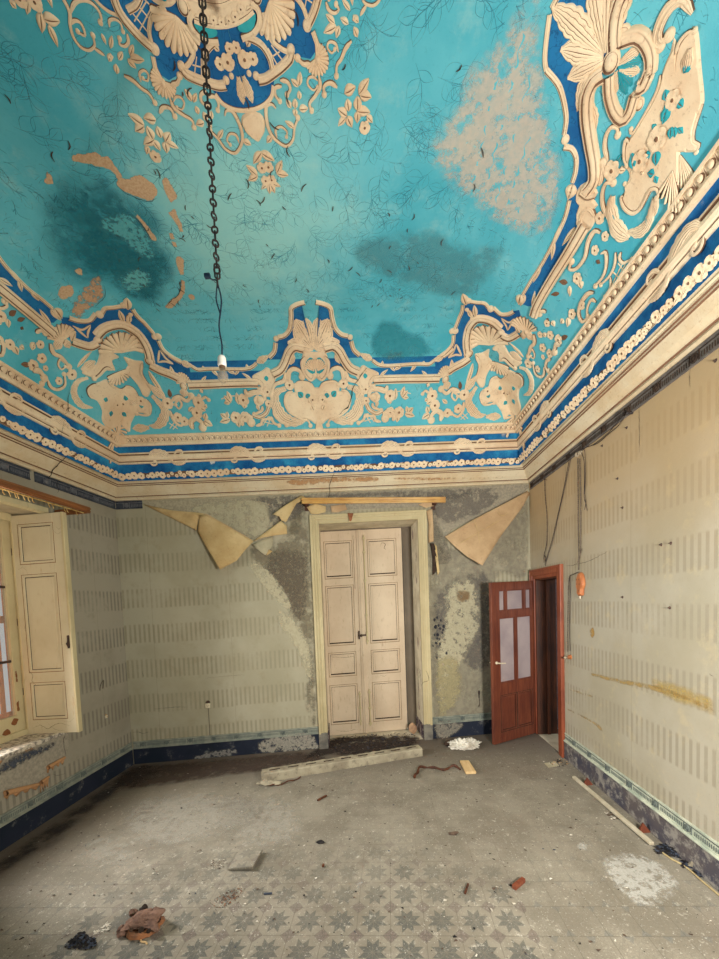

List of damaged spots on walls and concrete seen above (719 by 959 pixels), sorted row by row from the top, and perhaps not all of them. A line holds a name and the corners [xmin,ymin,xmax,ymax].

leakage [51,188,165,297]
peeling [68,141,195,311]
peeling [58,268,106,318]
flaking render [146,477,529,564]
flaking render [0,733,69,793]